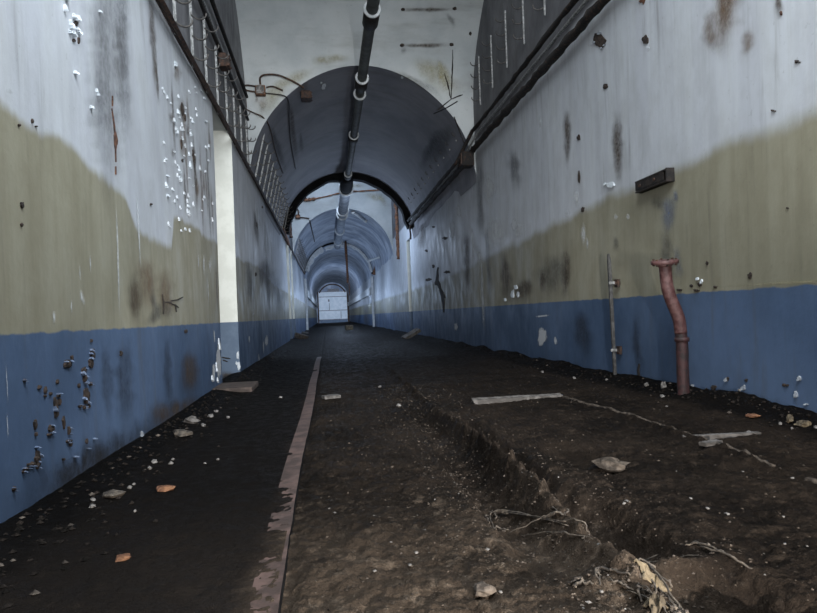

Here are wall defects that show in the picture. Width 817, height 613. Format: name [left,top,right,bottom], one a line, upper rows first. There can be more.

peeling [162,86,214,232]
peeling [77,339,96,409]
peeling [211,332,221,383]
peeling [33,379,80,461]
peeling [22,446,44,474]